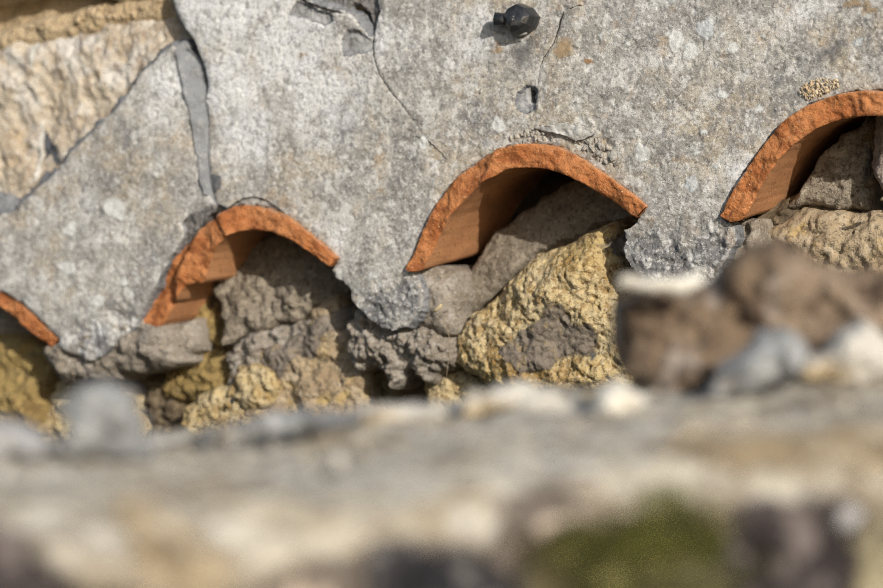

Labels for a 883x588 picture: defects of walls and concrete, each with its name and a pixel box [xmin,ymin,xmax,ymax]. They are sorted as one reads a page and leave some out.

flaking render [293,2,332,25]
crack [302,0,343,13]
flaking render [326,0,380,29]
crack [538,4,585,83]
crack [373,37,445,157]
flaking render [212,173,221,193]
flaking render [180,205,221,253]
flaking render [615,270,704,295]